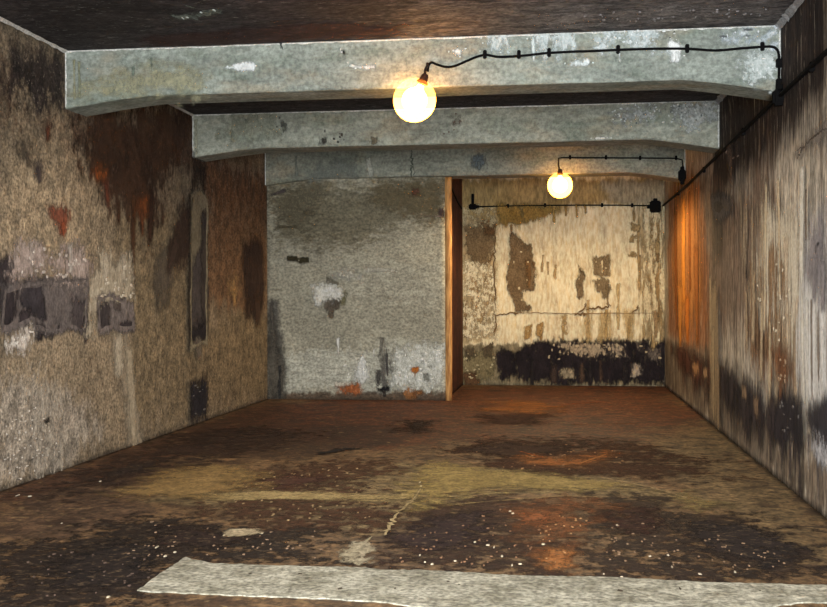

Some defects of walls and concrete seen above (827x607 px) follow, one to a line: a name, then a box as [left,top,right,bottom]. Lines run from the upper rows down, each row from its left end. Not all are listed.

spalling [5,323,35,357]
rust [47,203,71,237]
peeling [4,237,136,338]
damp [71,104,210,358]
damp [227,234,287,399]
peeling [463,204,557,385]
crack [488,222,659,336]
spalling [575,255,613,305]
damp [682,278,801,492]
damp [804,211,827,310]